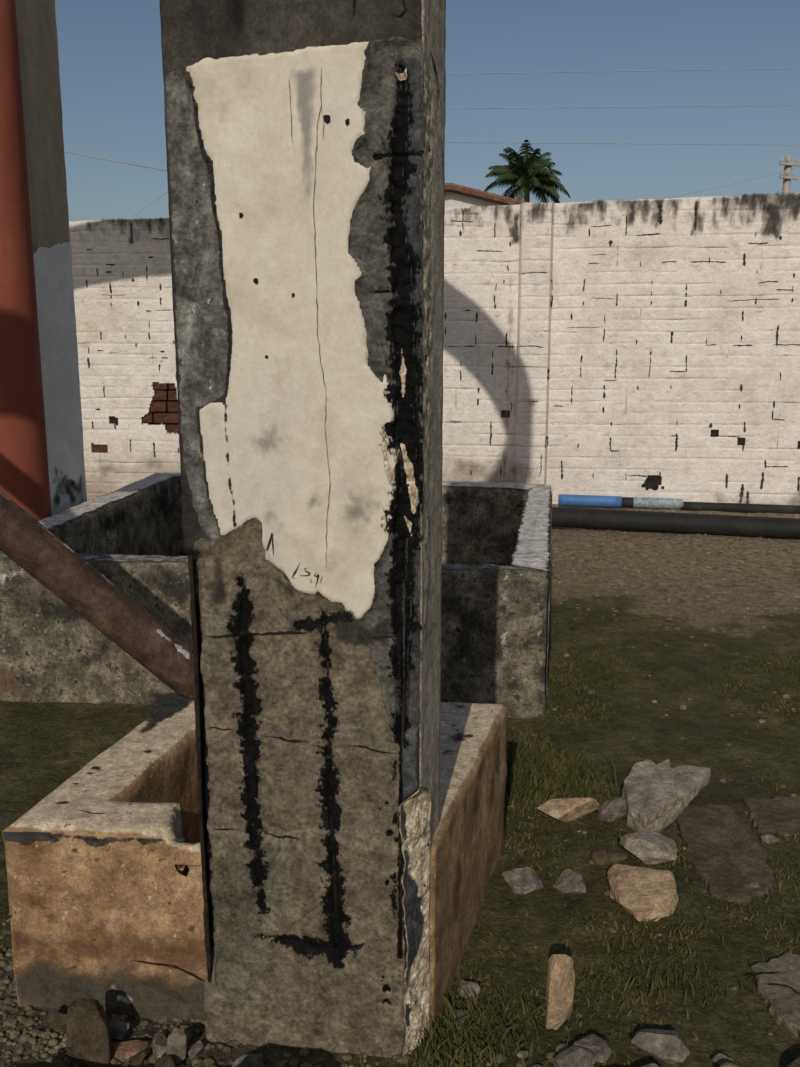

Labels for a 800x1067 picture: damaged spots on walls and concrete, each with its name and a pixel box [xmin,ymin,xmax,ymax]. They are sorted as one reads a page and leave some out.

damp [111,218,165,243]
damp [461,203,545,242]
damp [568,200,607,227]
damp [623,200,678,223]
damp [691,193,800,237]
spalling [91,443,108,452]
peeling [54,468,82,504]
spalling [141,37,433,1057]
spalling [3,831,160,847]